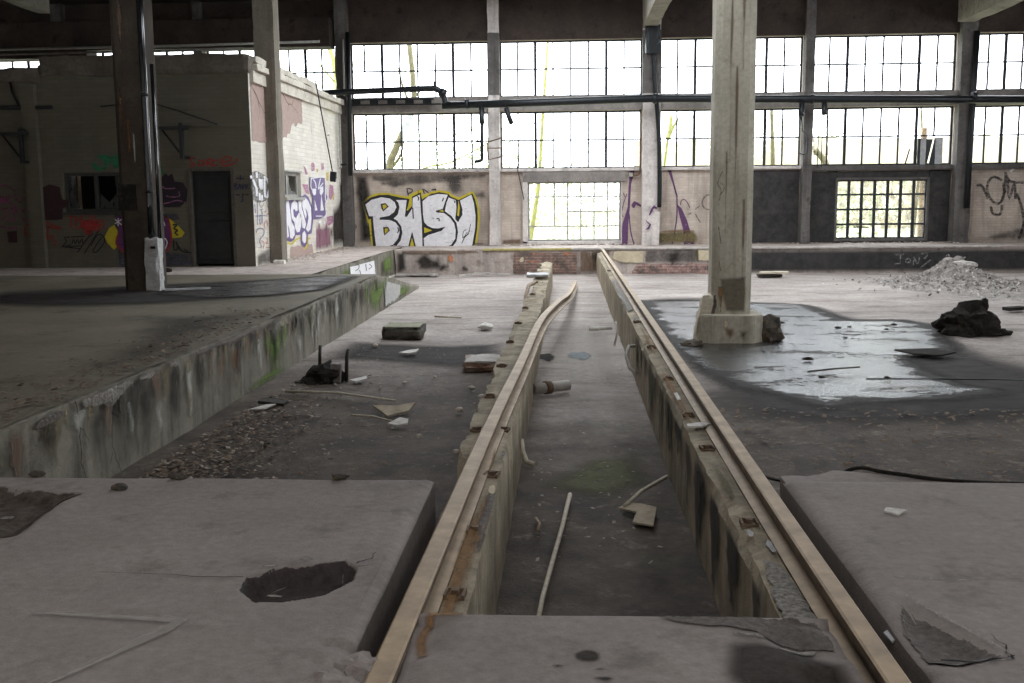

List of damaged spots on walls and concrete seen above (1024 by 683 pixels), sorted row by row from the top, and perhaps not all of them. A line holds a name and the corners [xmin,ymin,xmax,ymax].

peeling [250,82,266,143]
peeling [281,93,303,138]
leakage [0,279,277,305]
spalling [82,371,155,408]
leakage [46,279,387,460]
leakage [729,350,1024,421]
spalling [0,487,80,538]
hole [239,558,356,603]
corrosion [417,498,486,657]